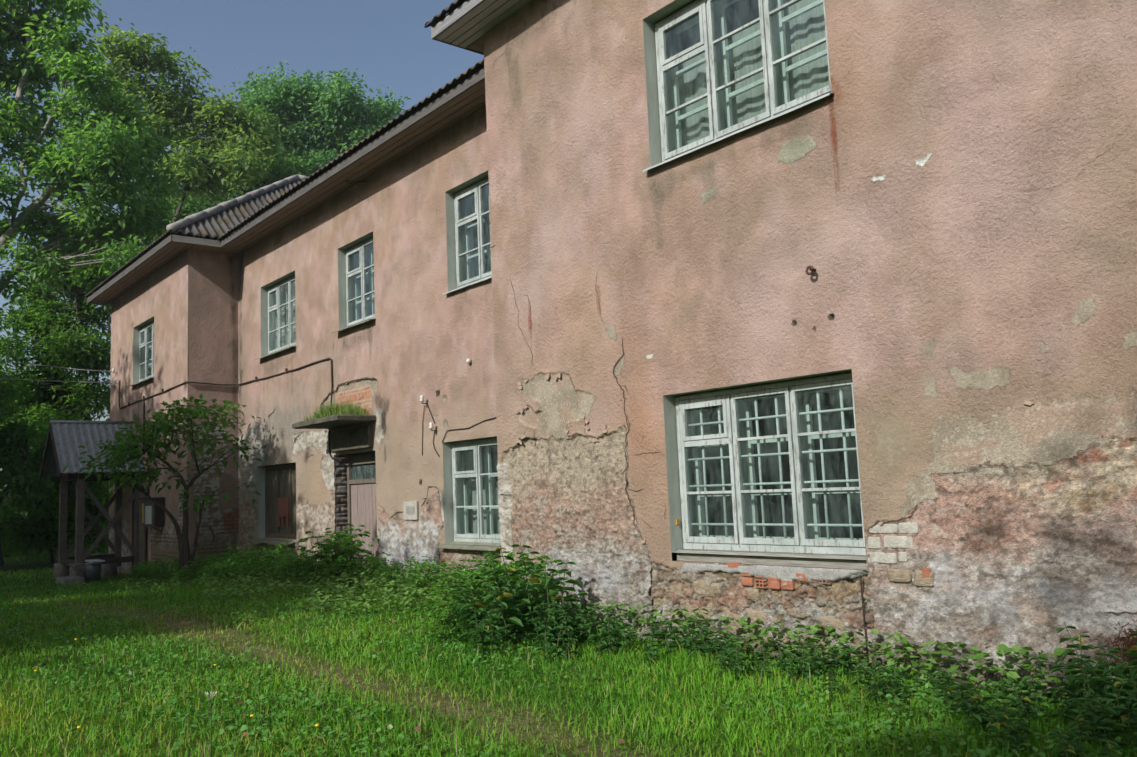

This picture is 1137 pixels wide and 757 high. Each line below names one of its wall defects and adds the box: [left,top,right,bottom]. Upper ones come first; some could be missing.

rust [830,94,839,152]
flaking render [321,379,384,448]
crack [595,276,666,529]
flaking render [950,365,1011,390]
flaking render [292,429,338,561]
flaking render [377,488,444,582]
flaking render [497,372,653,639]
flaking render [864,392,1137,701]